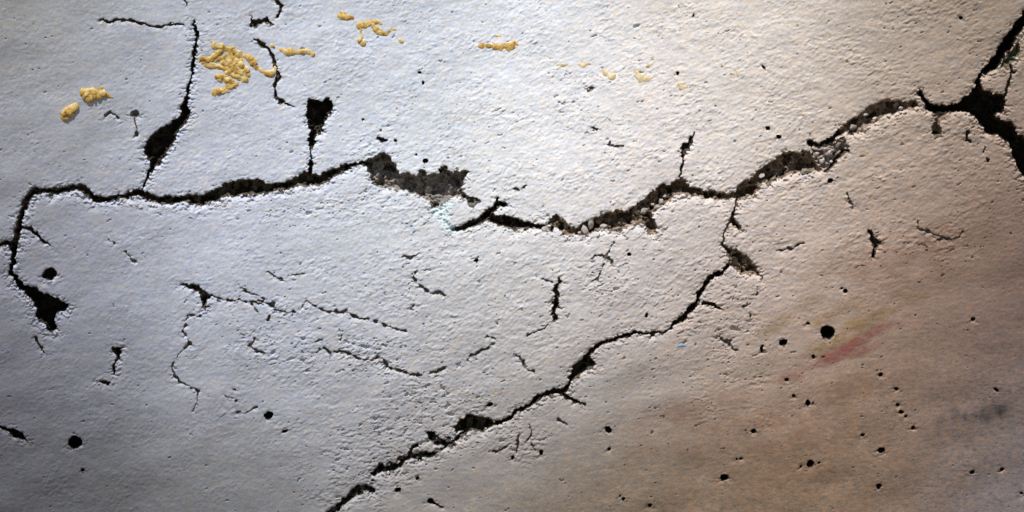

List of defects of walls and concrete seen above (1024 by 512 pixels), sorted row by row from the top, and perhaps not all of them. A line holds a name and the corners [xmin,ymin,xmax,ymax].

crack [965,129,990,163]
crack [0,0,369,354]
crack [917,220,964,241]
crack [171,98,918,512]
crack [99,346,124,386]